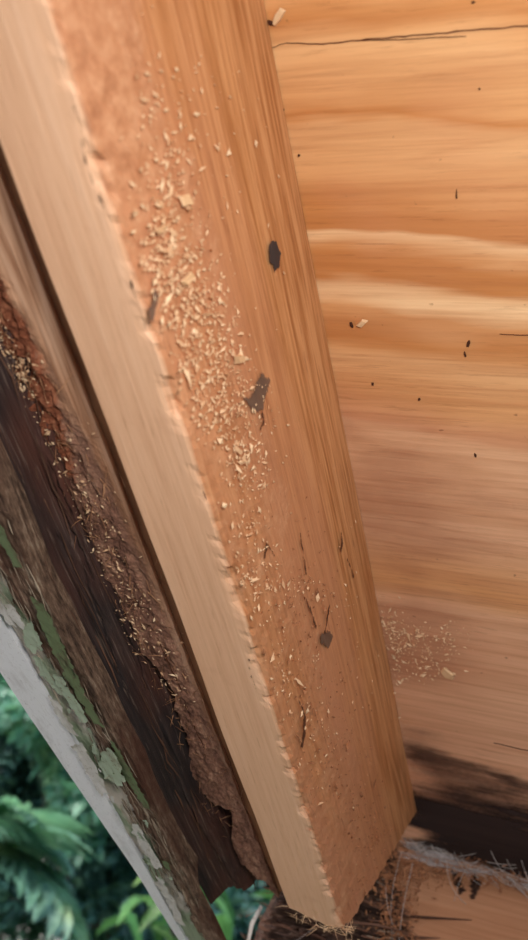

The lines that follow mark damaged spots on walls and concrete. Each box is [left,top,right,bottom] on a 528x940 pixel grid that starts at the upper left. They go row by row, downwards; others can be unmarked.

crack [272,25,528,48]
peeling [0,525,22,568]
peeling [0,596,186,926]
damp [408,746,528,878]
damp [447,868,481,899]